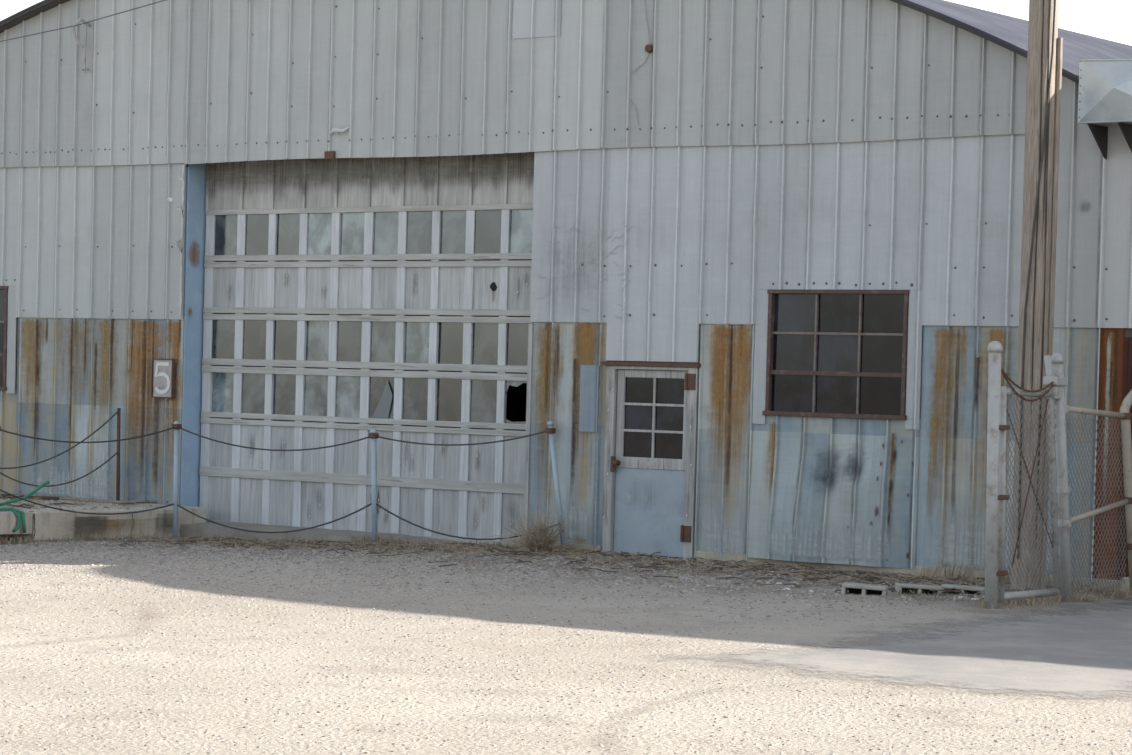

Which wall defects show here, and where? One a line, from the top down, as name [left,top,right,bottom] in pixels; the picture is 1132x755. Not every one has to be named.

rust [19,320,47,444]
rust [68,319,114,427]
rust [131,310,191,479]
rust [538,323,559,413]
rust [571,323,594,476]
rust [712,325,749,484]
rust [1104,331,1118,452]